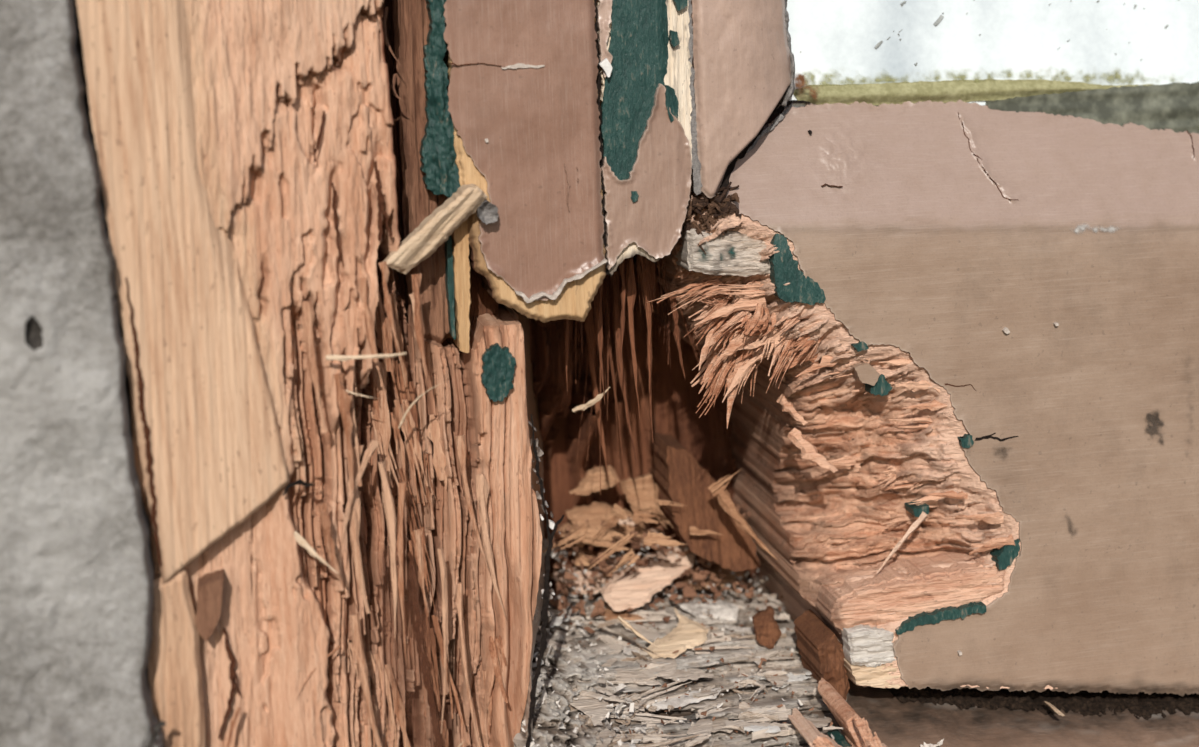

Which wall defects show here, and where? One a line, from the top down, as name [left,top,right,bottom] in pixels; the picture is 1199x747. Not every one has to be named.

peeling [672,0,688,11]
peeling [668,30,680,47]
peeling [664,85,679,122]
crack [958,112,1018,200]
crack [313,111,342,262]
crack [374,161,393,241]
peeling [851,362,880,386]
crack [959,433,1018,442]
crack [218,628,240,739]
crack [147,720,166,747]